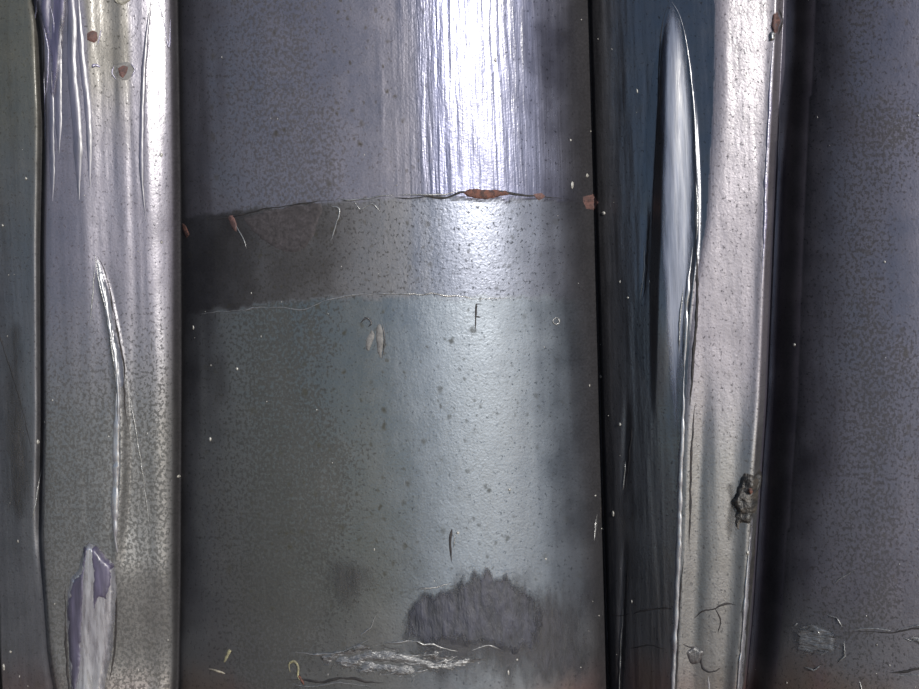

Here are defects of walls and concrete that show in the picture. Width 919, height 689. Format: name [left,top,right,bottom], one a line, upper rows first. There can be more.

corrosion [87,30,101,43]
corrosion [111,62,135,80]
spalling [64,543,118,689]
crack [853,625,919,634]
crack [890,667,919,676]
crack [288,677,383,687]